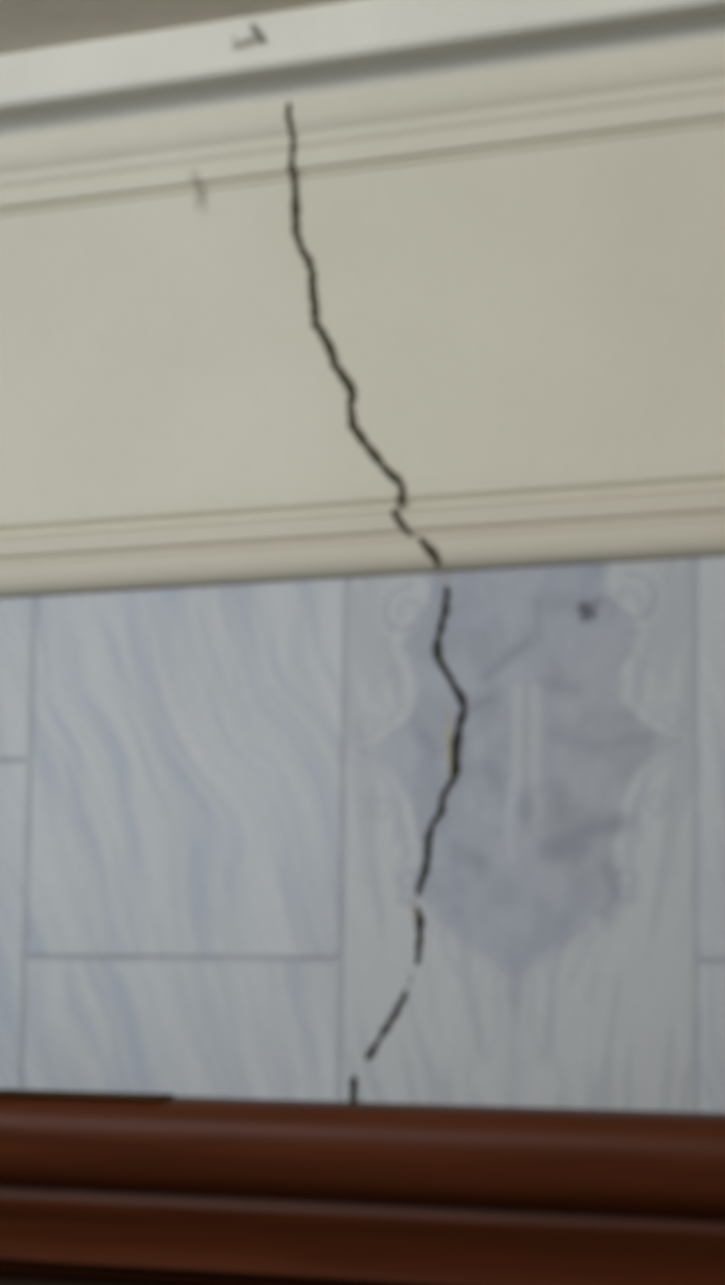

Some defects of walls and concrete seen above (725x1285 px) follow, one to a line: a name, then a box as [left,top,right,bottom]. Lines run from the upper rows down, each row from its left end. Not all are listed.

crack [285,102,466,1102]